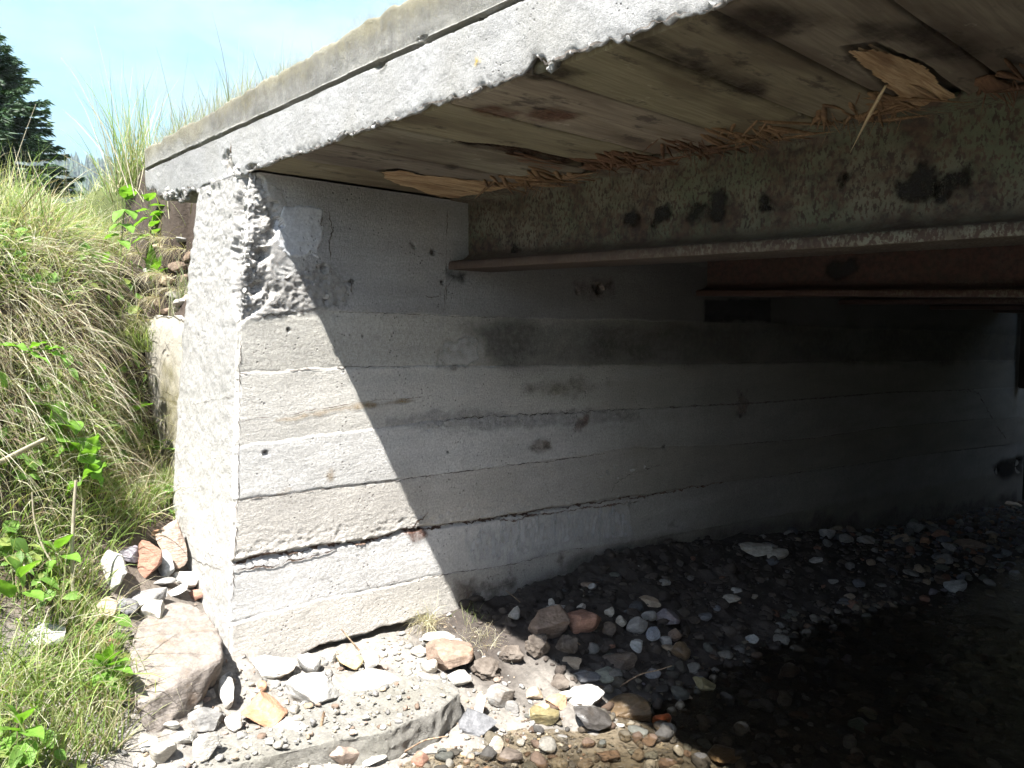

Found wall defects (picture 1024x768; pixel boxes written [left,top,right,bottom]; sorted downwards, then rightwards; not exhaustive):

spalling [149,0,728,320]
crack [161,211,724,607]